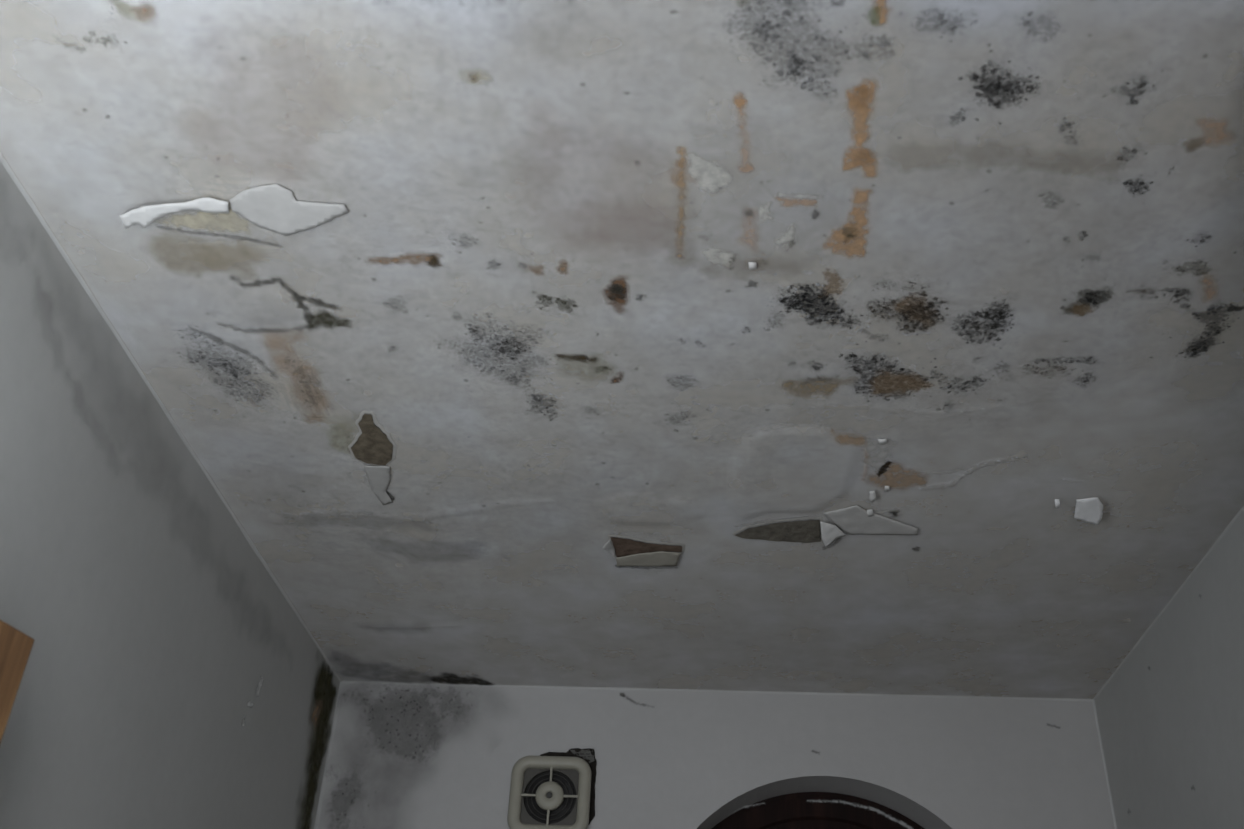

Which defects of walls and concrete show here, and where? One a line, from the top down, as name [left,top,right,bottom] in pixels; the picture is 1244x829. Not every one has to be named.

rust [843,82,875,176]
peeling [120,184,348,245]
rust [827,191,868,256]
crack [241,279,348,328]
damp [782,272,847,324]
flaking render [348,411,397,505]
flaking render [732,435,926,551]
peeling [1074,497,1103,525]
flaking render [603,535,685,567]
damp [432,673,492,686]
damp [301,665,336,829]